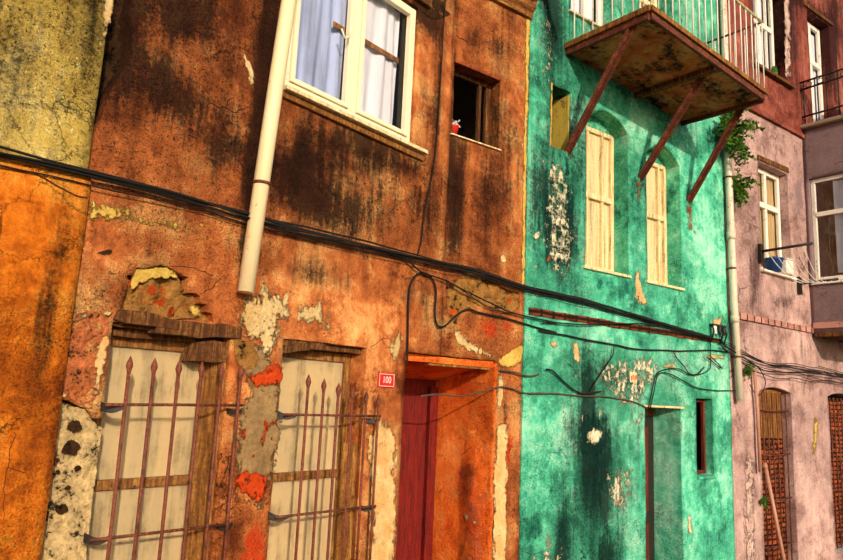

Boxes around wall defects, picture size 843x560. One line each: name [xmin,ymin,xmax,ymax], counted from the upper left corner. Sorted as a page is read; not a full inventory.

peeling [521,10,574,285]
spalling [41,266,208,560]
peeling [233,281,331,510]
peeling [367,417,398,560]
peeling [447,268,523,560]
peeling [533,524,563,560]
peeling [572,342,581,363]
damp [580,408,612,503]
peeling [606,466,637,518]
peeling [597,356,675,427]